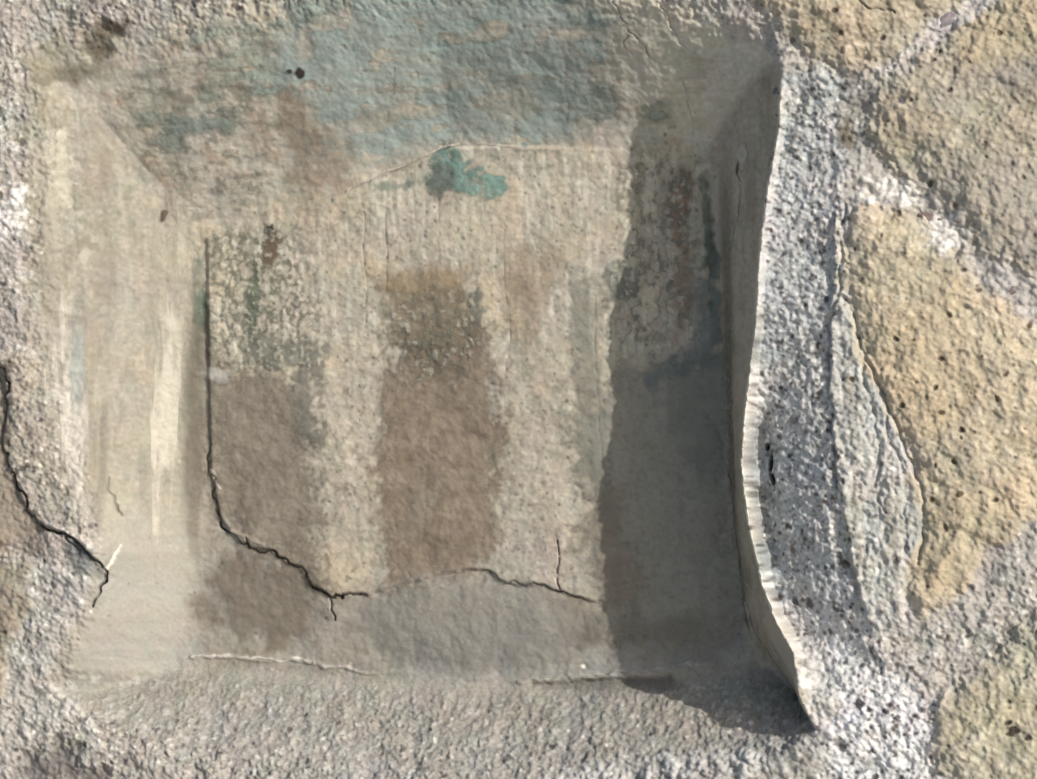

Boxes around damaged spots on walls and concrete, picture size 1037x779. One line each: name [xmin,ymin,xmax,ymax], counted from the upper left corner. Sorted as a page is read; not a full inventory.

crack [7,453,108,591]
damp [150,186,333,594]
peeling [207,231,328,382]
crack [247,543,360,620]
damp [371,281,510,595]
peeling [605,162,697,336]